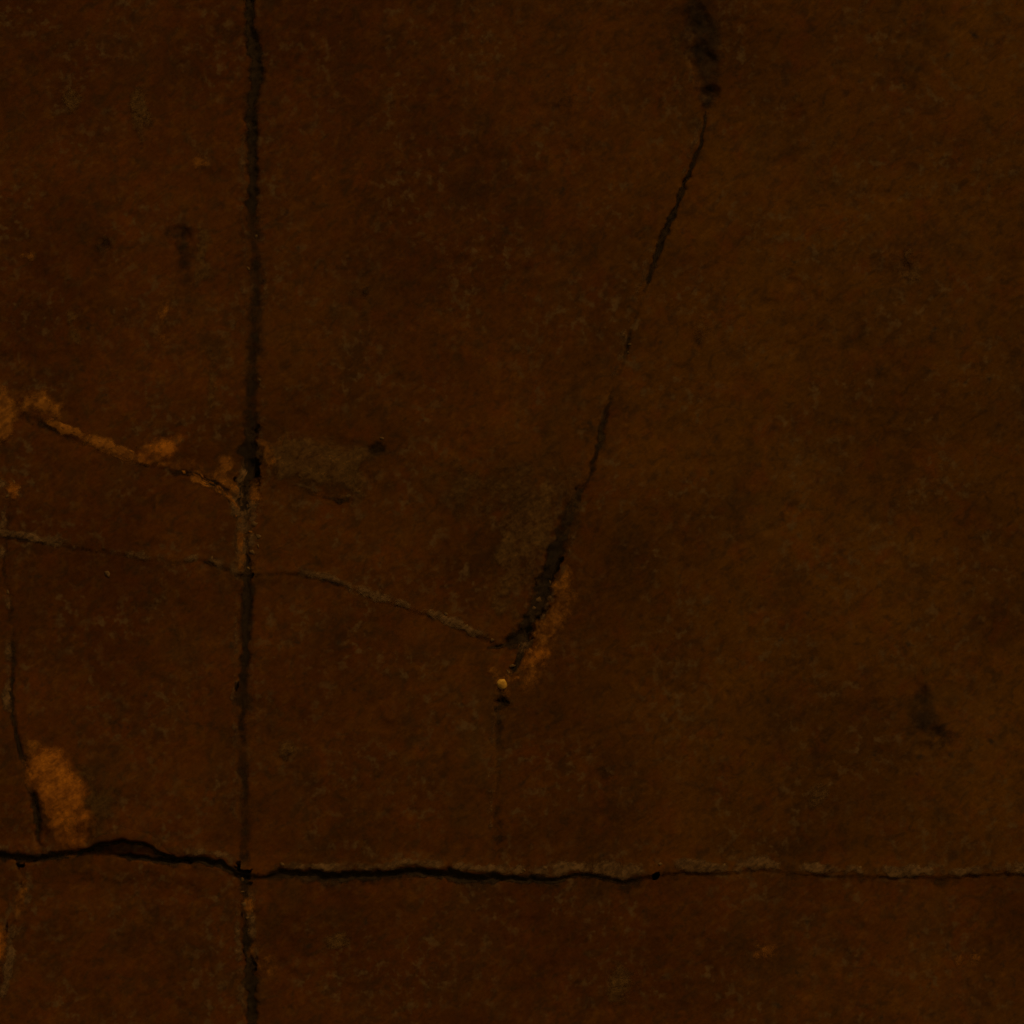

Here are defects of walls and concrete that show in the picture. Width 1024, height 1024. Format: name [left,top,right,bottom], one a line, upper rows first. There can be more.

crack [0,0,780,1024]
corrosion [26,740,115,846]
crack [800,862,1024,883]